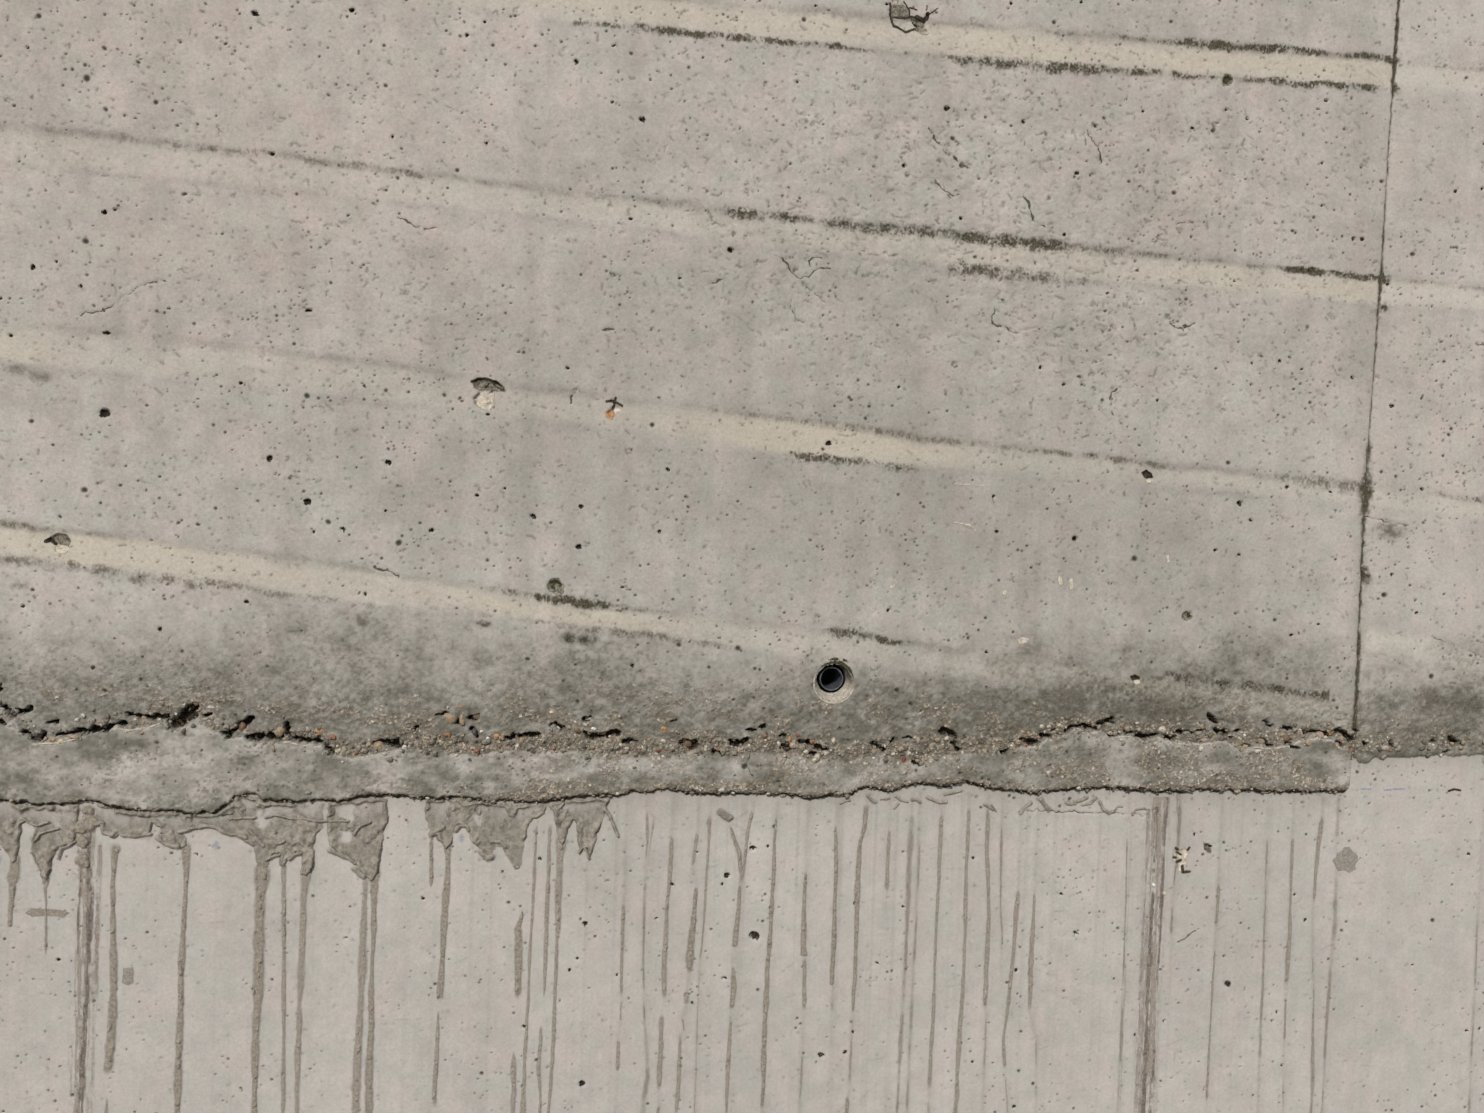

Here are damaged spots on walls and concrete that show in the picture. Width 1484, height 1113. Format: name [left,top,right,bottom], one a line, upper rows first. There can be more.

spalling [889,0,938,35]